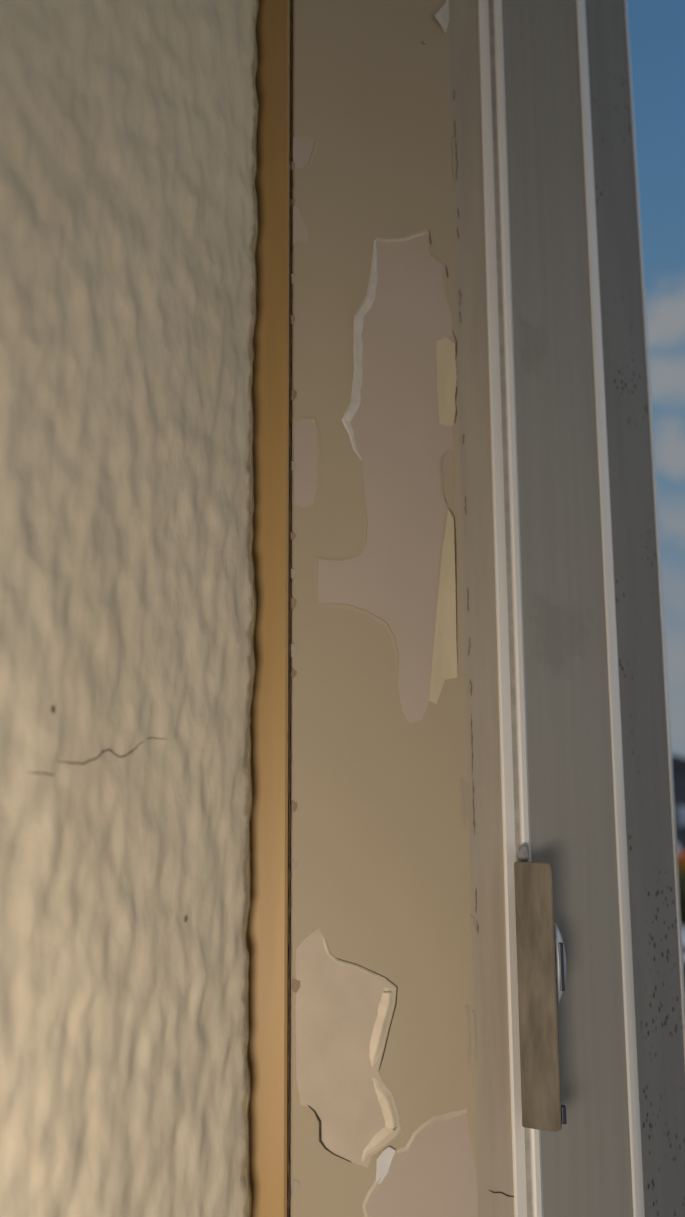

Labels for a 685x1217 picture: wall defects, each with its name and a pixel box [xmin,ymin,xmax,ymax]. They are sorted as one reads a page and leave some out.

peeling [313,229,458,723]
crack [31,737,165,776]
peeling [296,928,478,1217]